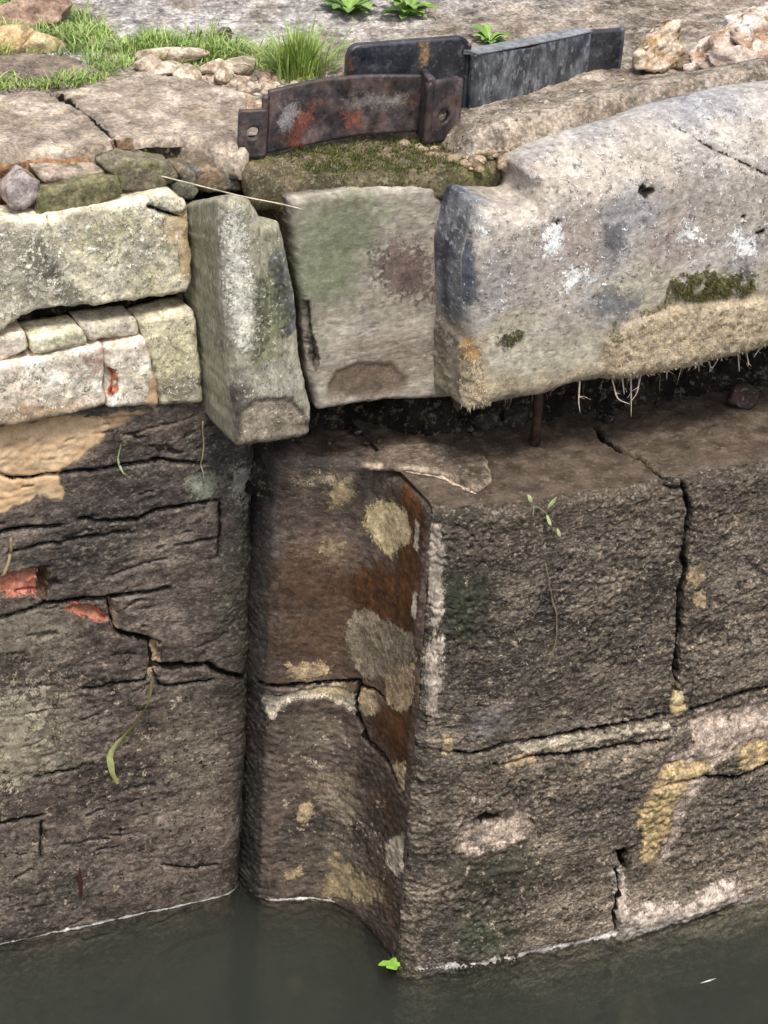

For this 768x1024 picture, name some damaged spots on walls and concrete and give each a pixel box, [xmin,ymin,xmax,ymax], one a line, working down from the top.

rust [282,104,315,149]
crack [1,457,199,479]
crack [0,498,222,556]
crack [447,429,690,764]
crack [701,685,768,705]
crack [611,850,625,928]
water stain [455,911,509,955]